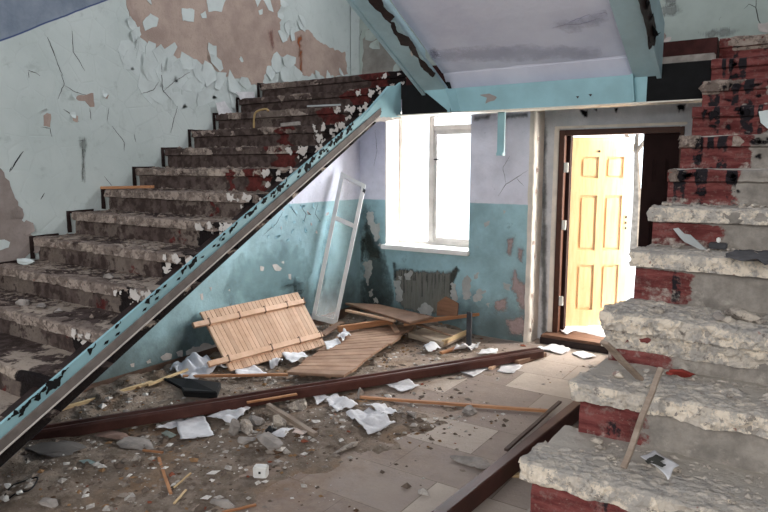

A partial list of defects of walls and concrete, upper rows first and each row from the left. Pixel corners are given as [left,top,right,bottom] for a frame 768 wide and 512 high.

crack [47,35,136,146]
peeling [117,0,348,135]
spalling [71,29,405,248]
peeling [368,0,435,77]
spalling [699,79,747,95]
peeling [759,110,768,129]
peeling [0,168,204,312]
spalling [646,202,768,226]
spalling [599,300,768,369]
spalling [7,367,69,421]
spalling [568,366,768,439]
spalling [518,436,768,512]